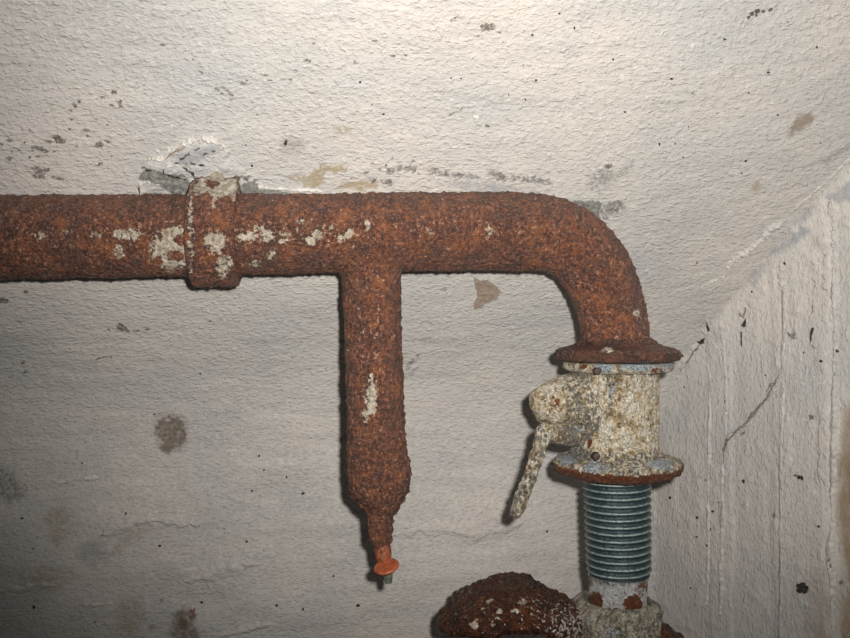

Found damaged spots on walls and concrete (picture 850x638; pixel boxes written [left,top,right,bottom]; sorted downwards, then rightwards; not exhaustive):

flaking render [138,148,215,195]
water stain [156,416,186,452]
crack [721,268,787,638]